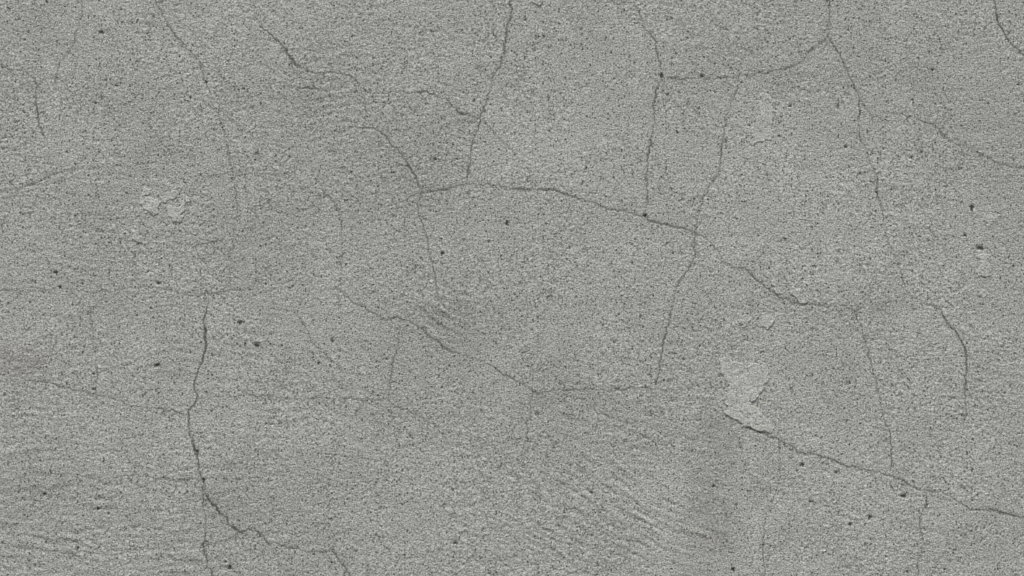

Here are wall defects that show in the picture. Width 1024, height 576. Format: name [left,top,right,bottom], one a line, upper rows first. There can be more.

crack [158,307,270,575]
peeling [718,357,773,433]